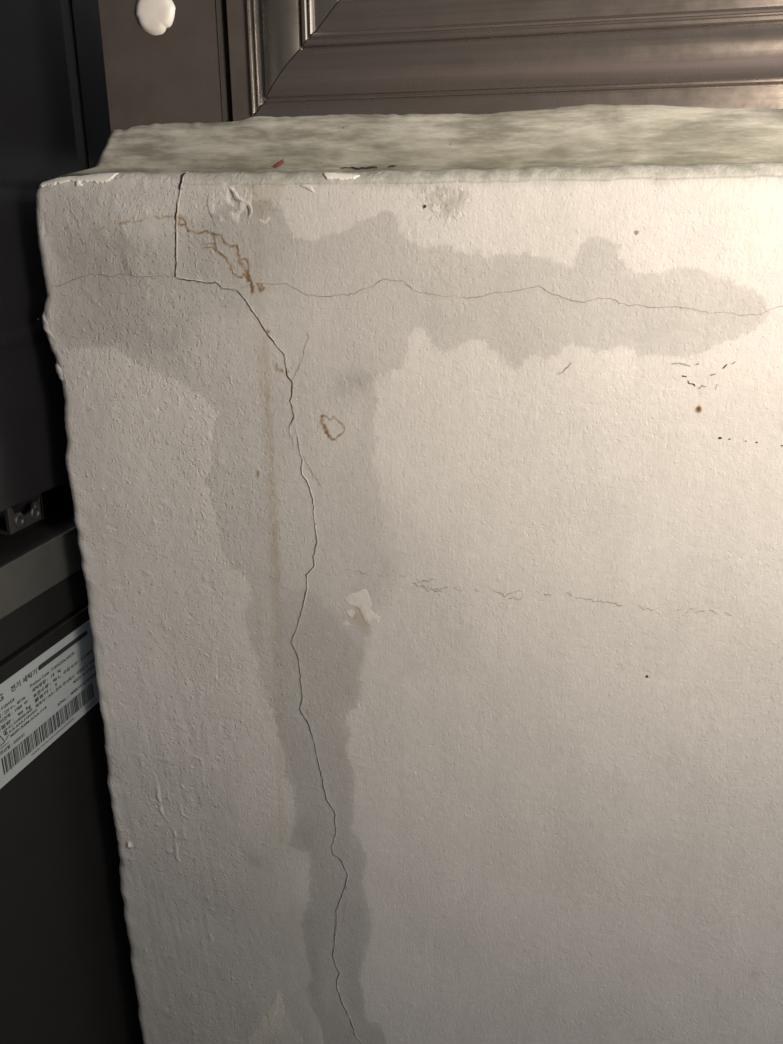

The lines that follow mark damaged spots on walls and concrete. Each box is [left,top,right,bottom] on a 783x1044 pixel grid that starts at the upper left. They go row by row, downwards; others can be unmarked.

crack [342,163,397,171]
peeling [342,589,380,626]
crack [52,172,783,1044]